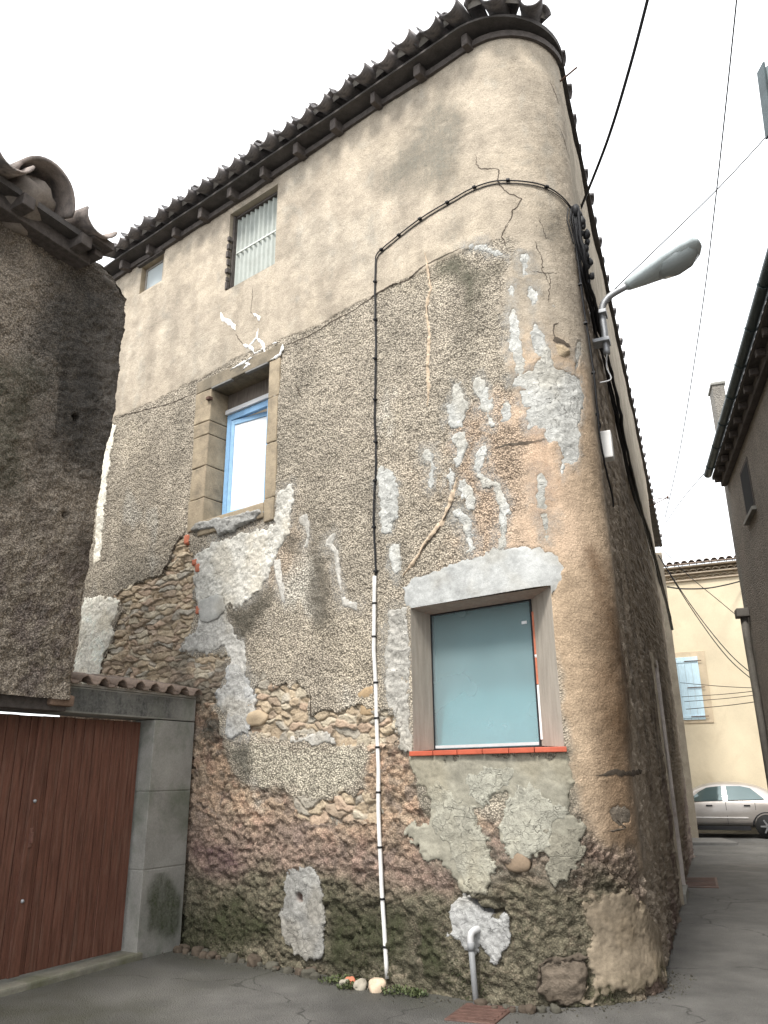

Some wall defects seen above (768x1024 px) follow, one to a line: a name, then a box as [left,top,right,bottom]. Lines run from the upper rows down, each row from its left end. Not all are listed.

crack [476,161,522,246]
crack [220,248,460,406]
peeling [501,309,584,422]
peeling [92,424,117,570]
crack [403,477,457,576]
peeling [422,431,469,490]
spalling [73,535,399,753]
spalling [294,787,384,828]
peeling [427,766,587,895]
crack [596,769,642,777]
leakage [330,907,405,967]
leakage [416,922,444,977]